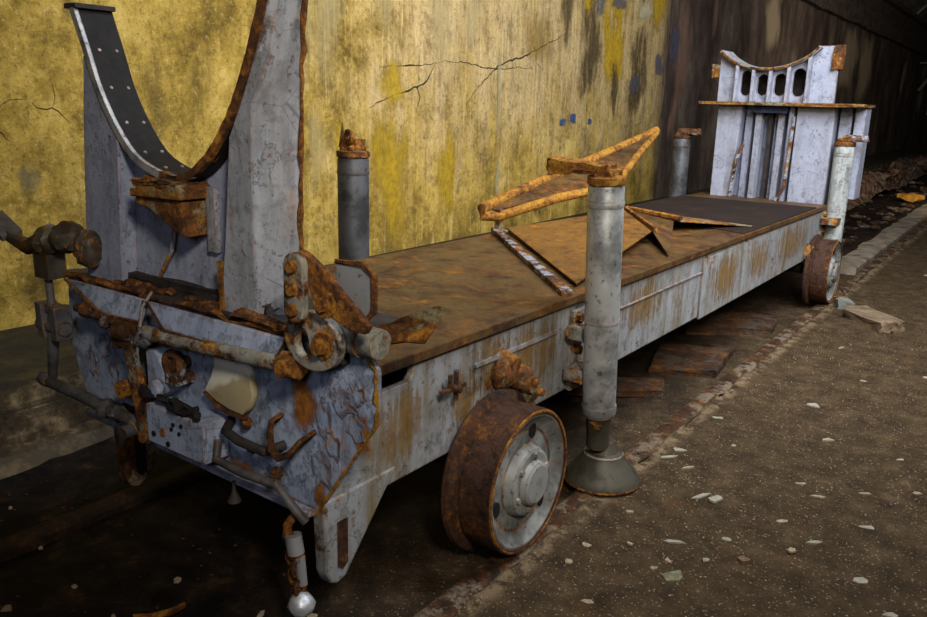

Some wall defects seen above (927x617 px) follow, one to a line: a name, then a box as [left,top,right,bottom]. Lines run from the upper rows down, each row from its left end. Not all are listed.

crack [369,36,562,108]
water stain [561,0,572,42]
water stain [580,0,600,96]
water stain [628,31,646,112]